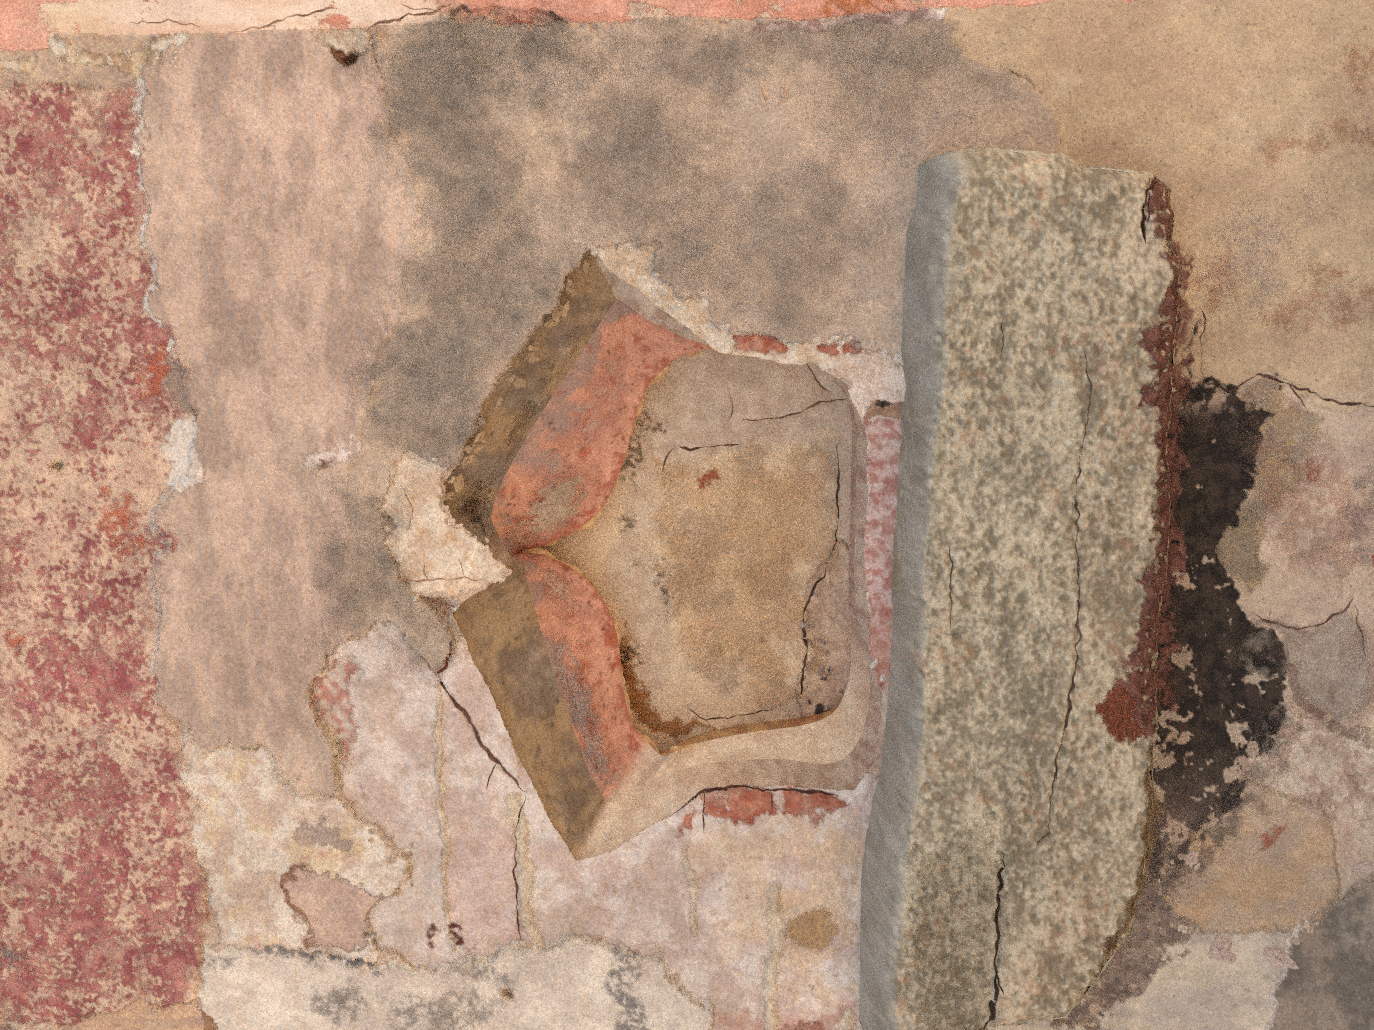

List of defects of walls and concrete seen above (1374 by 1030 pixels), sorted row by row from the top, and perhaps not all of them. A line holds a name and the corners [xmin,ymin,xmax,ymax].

spalling [0,0,906,1030]
crack [421,640,526,939]
crack [984,856,1005,1030]
crack [1037,356,1092,844]
damp [1050,177,1288,1030]
spalling [1157,611,1374,1030]
spalling [1218,379,1318,591]